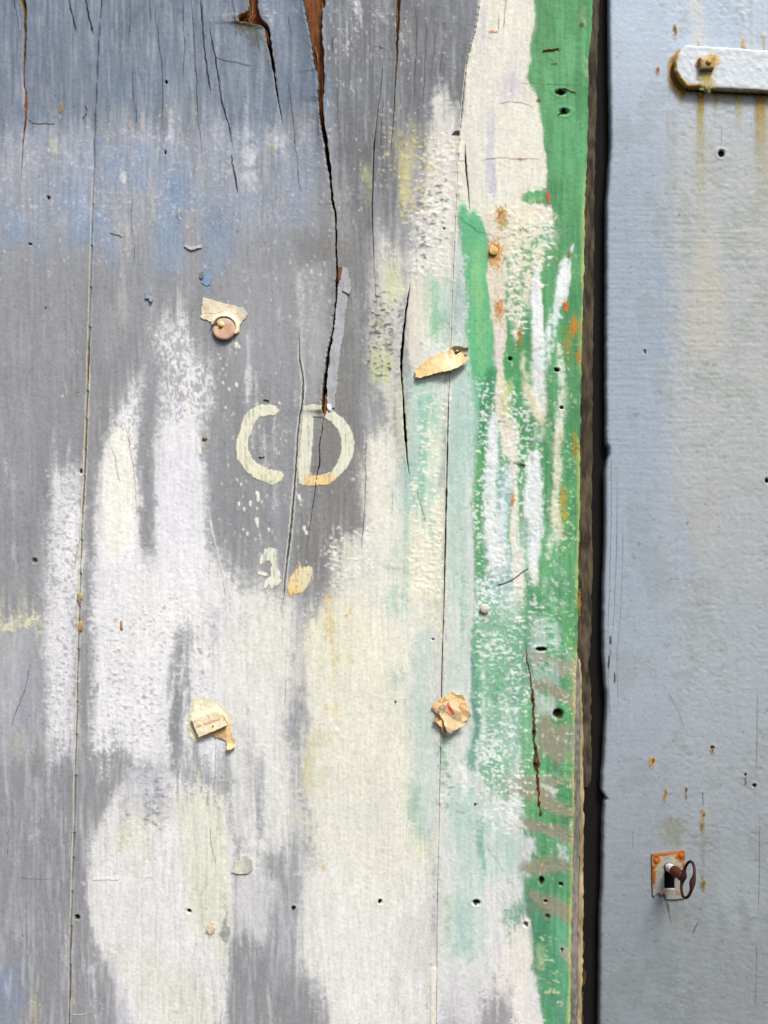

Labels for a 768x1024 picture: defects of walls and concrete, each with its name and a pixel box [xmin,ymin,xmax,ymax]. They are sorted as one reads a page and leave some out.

crack [16,0,27,169]
corrosion [656,49,763,119]
crack [183,0,339,608]
corrosion [486,205,509,269]
crack [525,643,542,815]